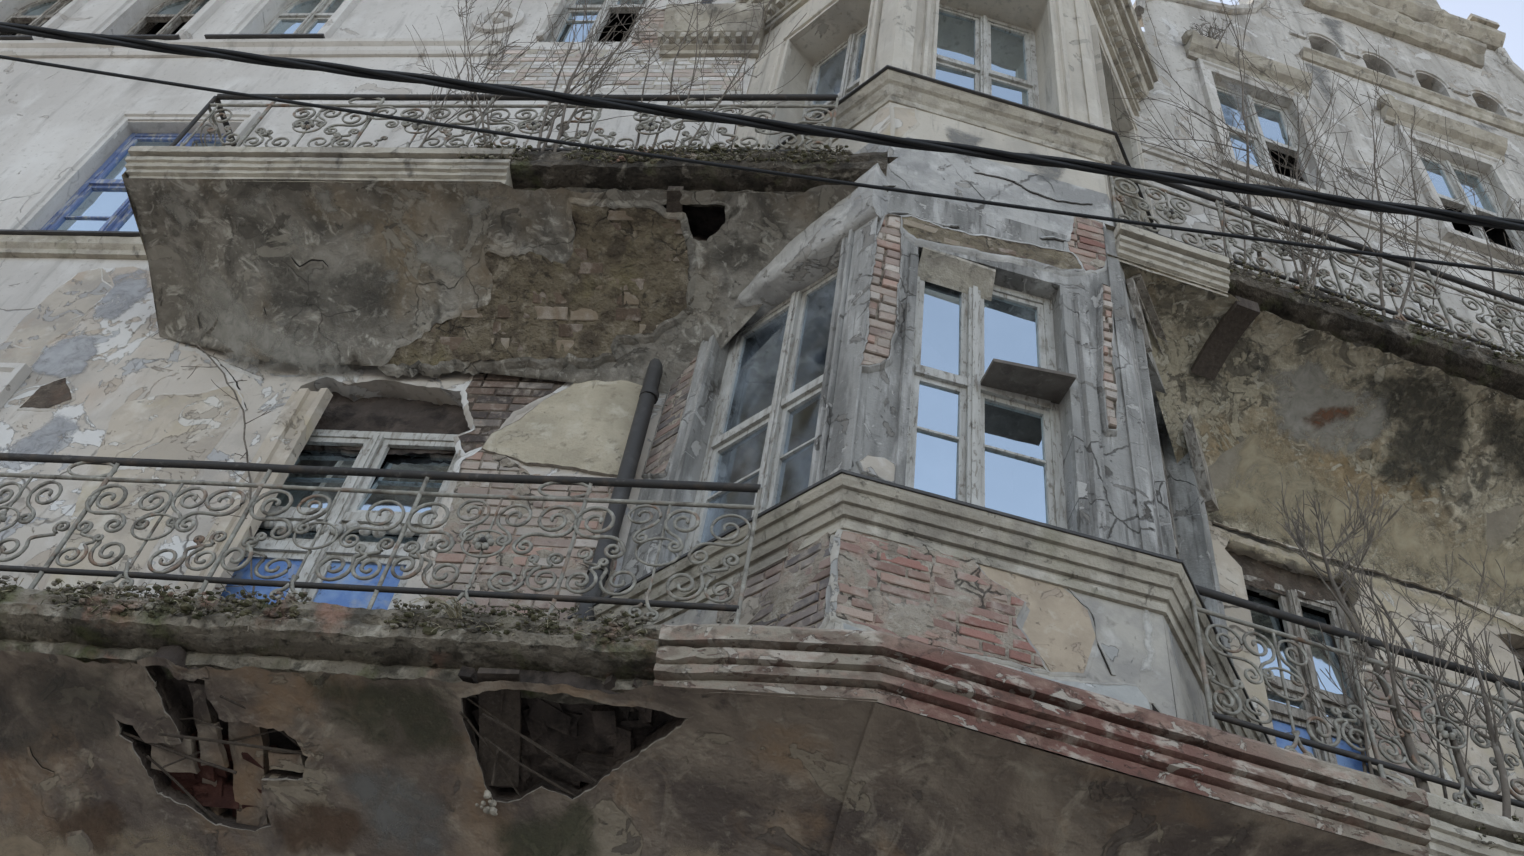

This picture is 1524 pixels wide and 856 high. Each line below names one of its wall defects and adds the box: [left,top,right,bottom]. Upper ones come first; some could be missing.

flaking render [0,268,151,454]
spalling [303,197,697,620]
damp [1218,361,1524,633]
spalling [715,529,1162,713]
damp [0,802,122,856]
damp [277,774,440,852]